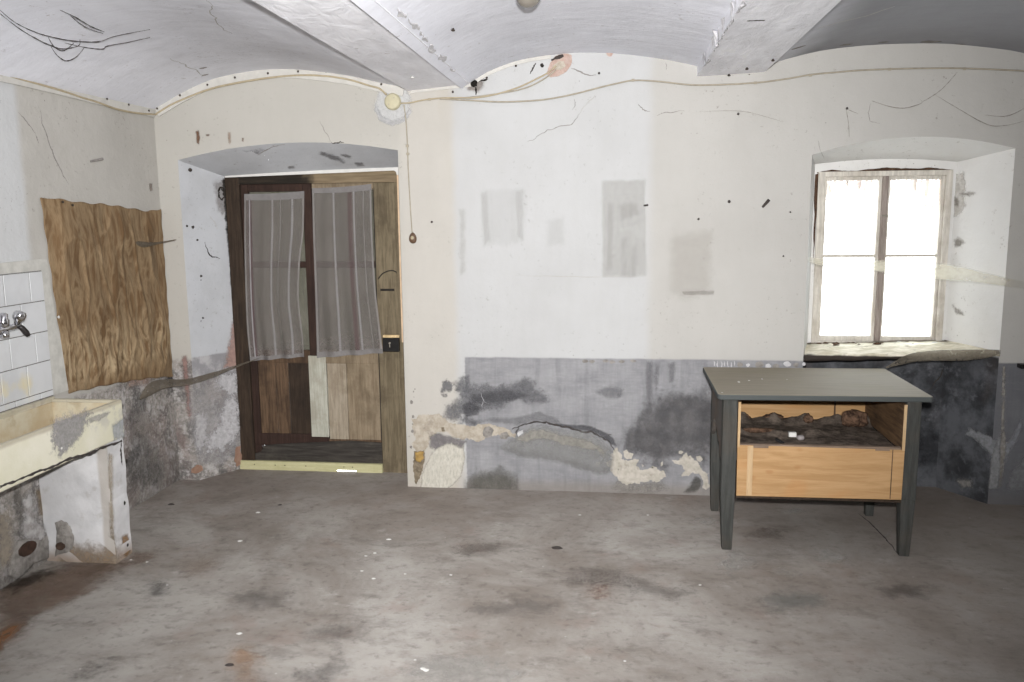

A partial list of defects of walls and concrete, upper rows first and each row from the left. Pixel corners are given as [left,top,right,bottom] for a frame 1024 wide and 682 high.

crack [530,69,594,141]
crack [18,106,68,183]
damp [195,373,240,453]
spalling [410,389,516,484]
damp [441,377,546,424]
crack [512,421,615,450]
peeling [606,448,710,492]
damp [626,396,711,466]
damp [965,366,1024,489]
peeling [0,491,74,567]